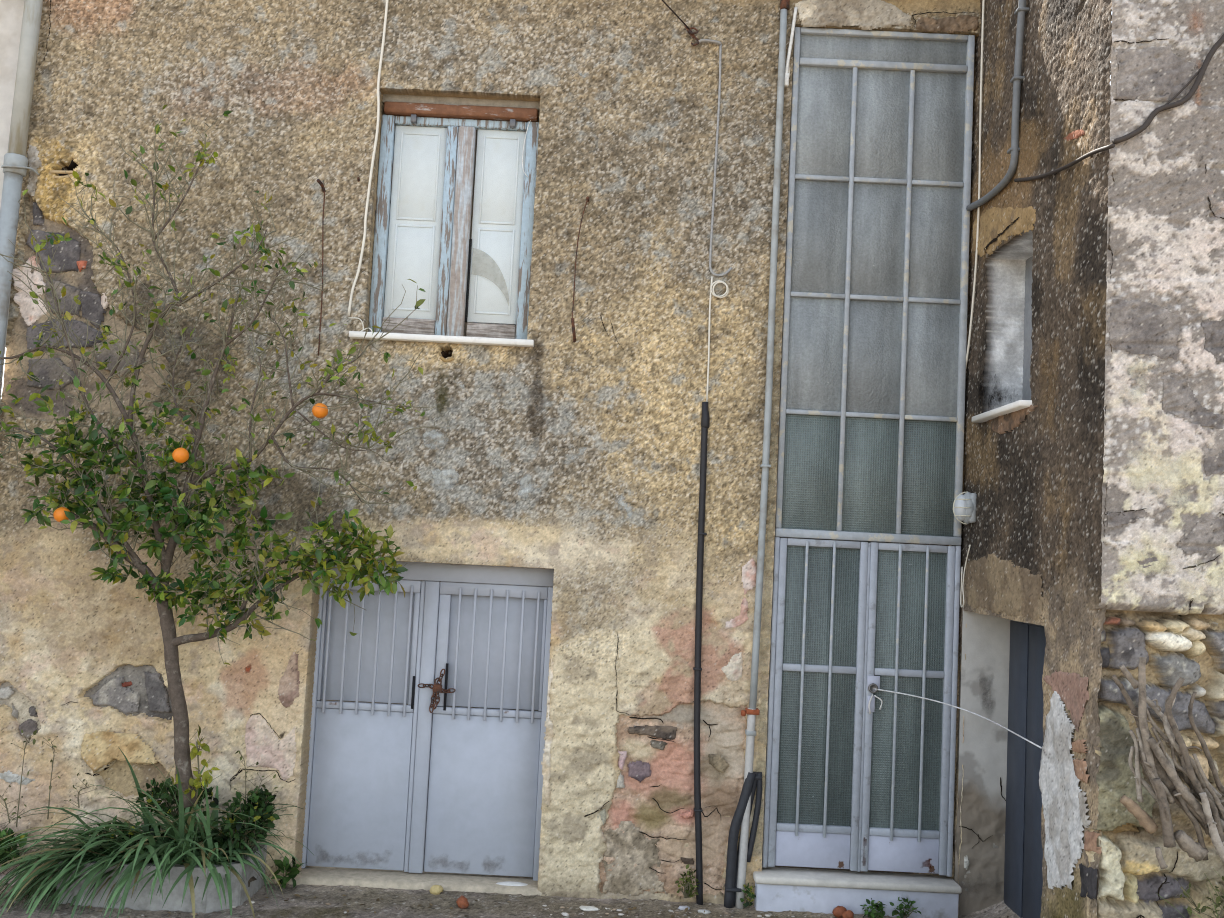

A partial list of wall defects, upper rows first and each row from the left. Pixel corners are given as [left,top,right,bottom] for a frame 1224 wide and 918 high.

flaking render [1,145,169,421]
flaking render [726,558,757,629]
flaking render [0,681,41,741]
flaking render [84,664,173,720]
flaking render [721,652,743,682]
flaking render [597,700,747,914]
peeling [1039,670,1102,900]
flaking render [561,906,600,916]